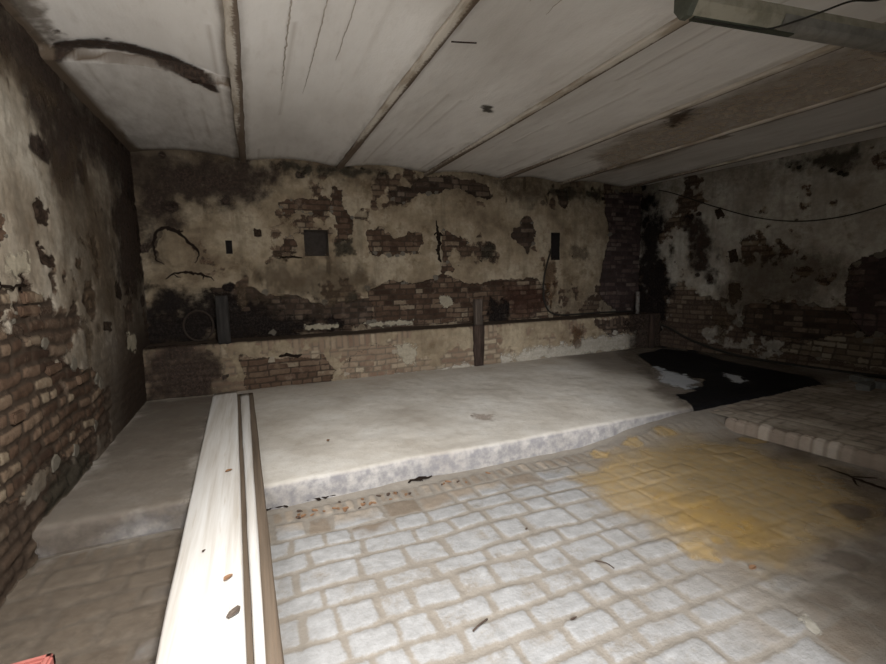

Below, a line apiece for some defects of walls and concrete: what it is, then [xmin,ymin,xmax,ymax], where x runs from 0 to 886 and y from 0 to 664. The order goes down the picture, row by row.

crack [281,0,292,89]
crack [303,0,328,91]
water stain [0,0,388,311]
crack [152,226,214,281]
flaking render [278,186,354,244]
flaking render [211,226,552,336]
crack [434,220,443,262]
water stain [683,211,838,343]
flaking render [728,249,886,370]
flaking render [0,241,104,510]
water stain [501,330,822,411]
water stain [580,426,886,562]